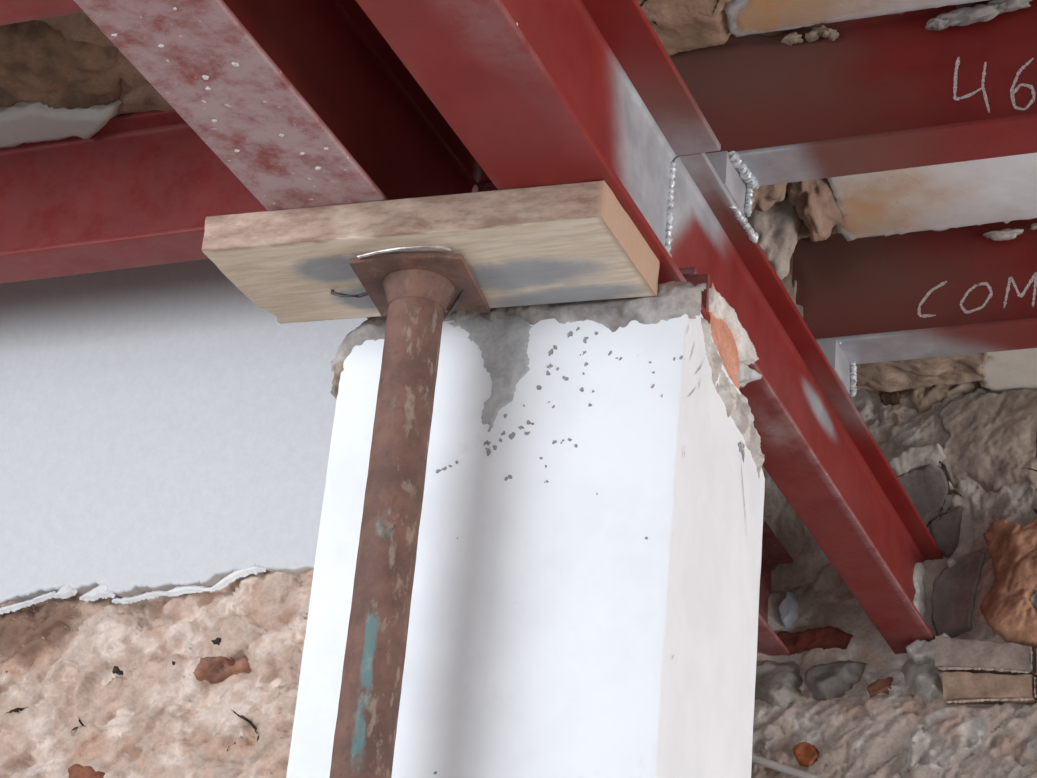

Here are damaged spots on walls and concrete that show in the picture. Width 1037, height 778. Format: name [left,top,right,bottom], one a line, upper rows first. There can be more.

spalling [637,0,731,56]
corrosion [737,0,837,32]
spalling [330,316,387,400]
spalling [444,281,765,478]
flaking render [0,565,266,614]
flaking render [935,519,1037,705]
flaking render [193,656,251,684]
flaking render [68,764,105,778]